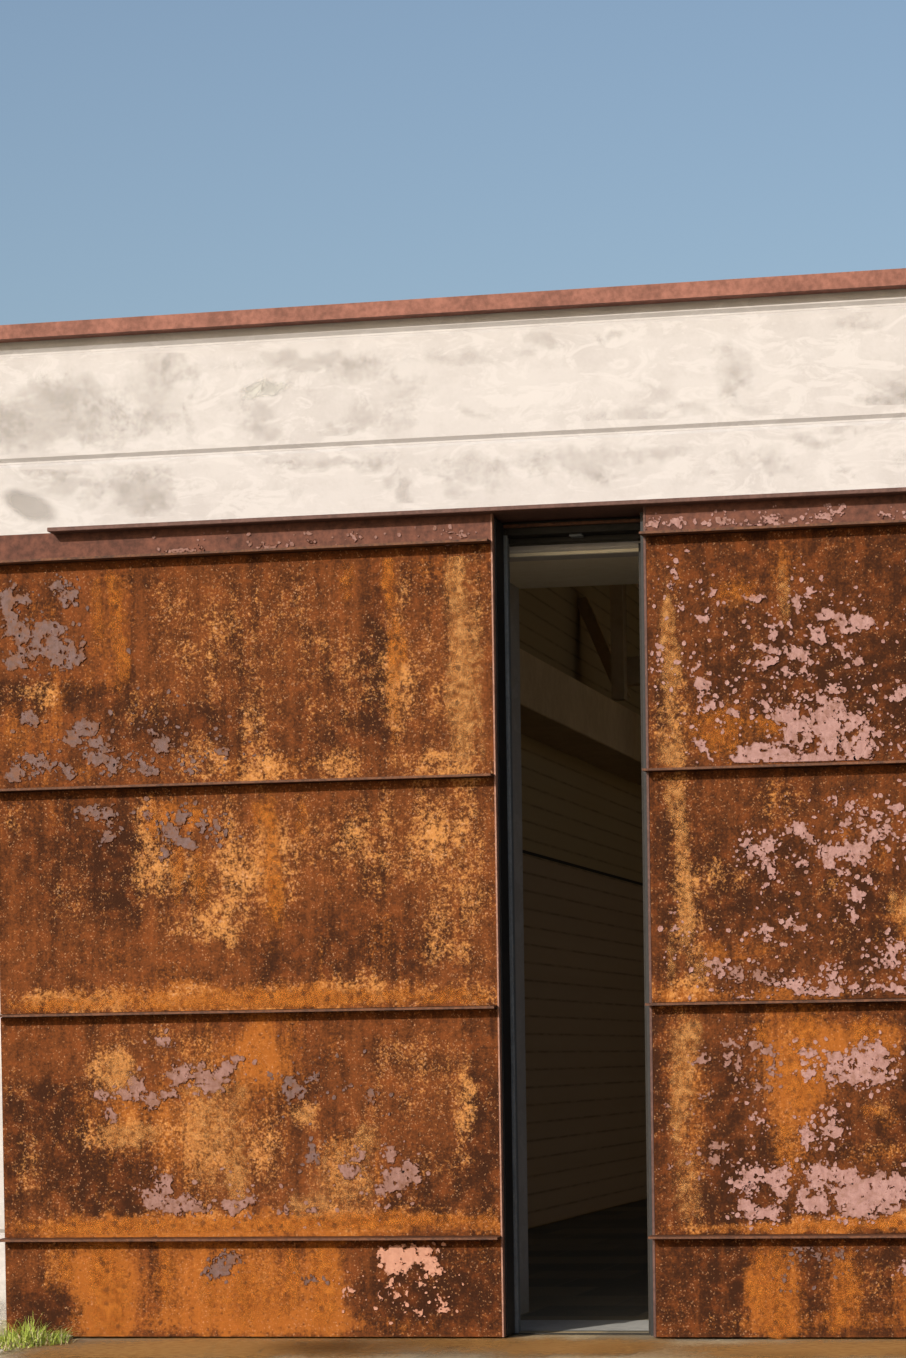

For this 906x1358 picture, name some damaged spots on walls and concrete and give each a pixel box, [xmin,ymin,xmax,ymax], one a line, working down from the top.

peeling [0,573,89,679]
rust [446,558,479,739]
rust [662,597,679,699]
peeling [647,549,906,764]
peeling [3,686,265,783]
peeling [658,779,906,1001]
rust [31,989,388,1011]
peeling [93,1024,412,1124]
rust [673,1019,701,1106]
rust [784,1018,815,1095]
peeling [658,1020,906,1231]
peeling [293,1242,464,1325]